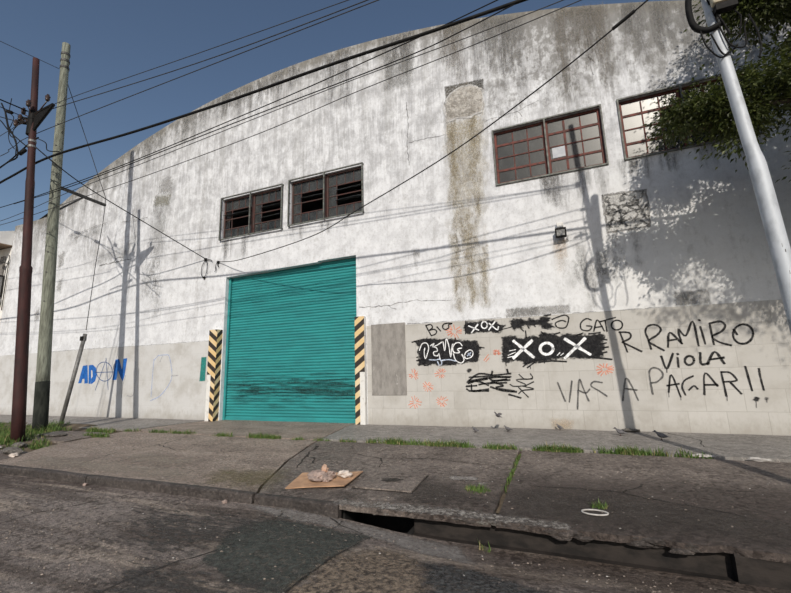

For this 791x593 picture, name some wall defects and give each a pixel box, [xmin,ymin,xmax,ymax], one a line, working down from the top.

spalling [443,79,485,122]